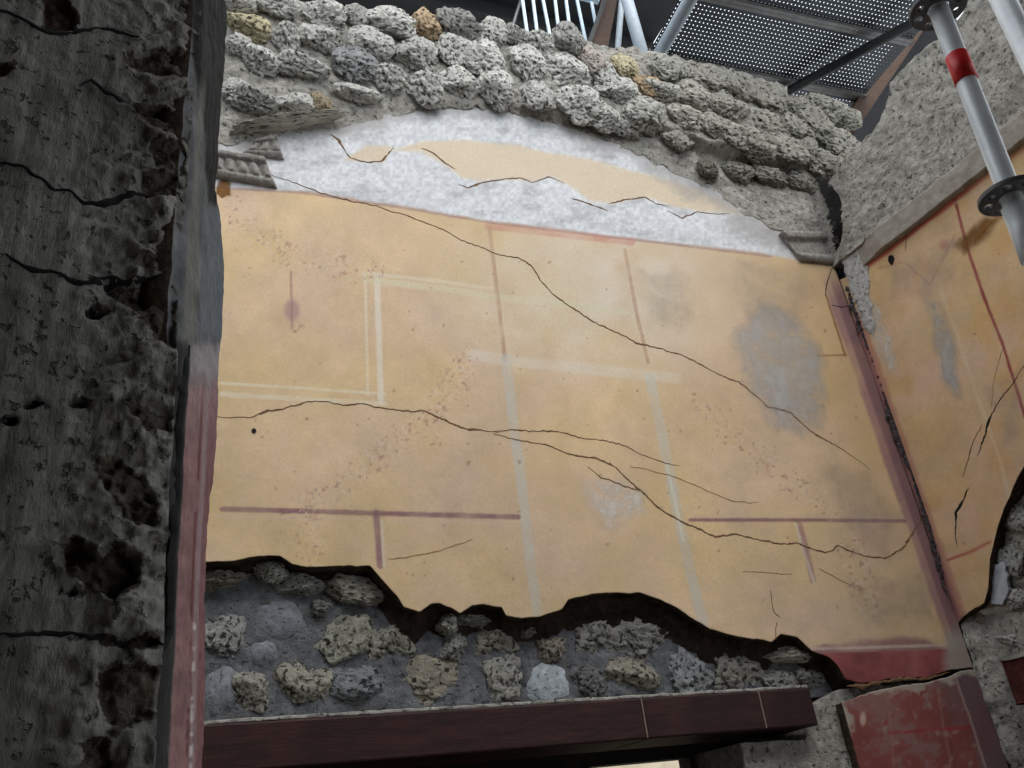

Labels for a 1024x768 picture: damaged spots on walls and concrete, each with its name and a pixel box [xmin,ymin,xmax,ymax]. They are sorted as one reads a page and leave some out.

crack [0,9,139,37]
crack [79,78,133,107]
crack [0,162,183,208]
crack [422,148,728,219]
crack [5,253,163,292]
flaking render [842,250,875,335]
crack [217,175,1024,611]
crack [0,345,191,650]
spalling [204,559,843,721]
spalling [961,494,1024,768]